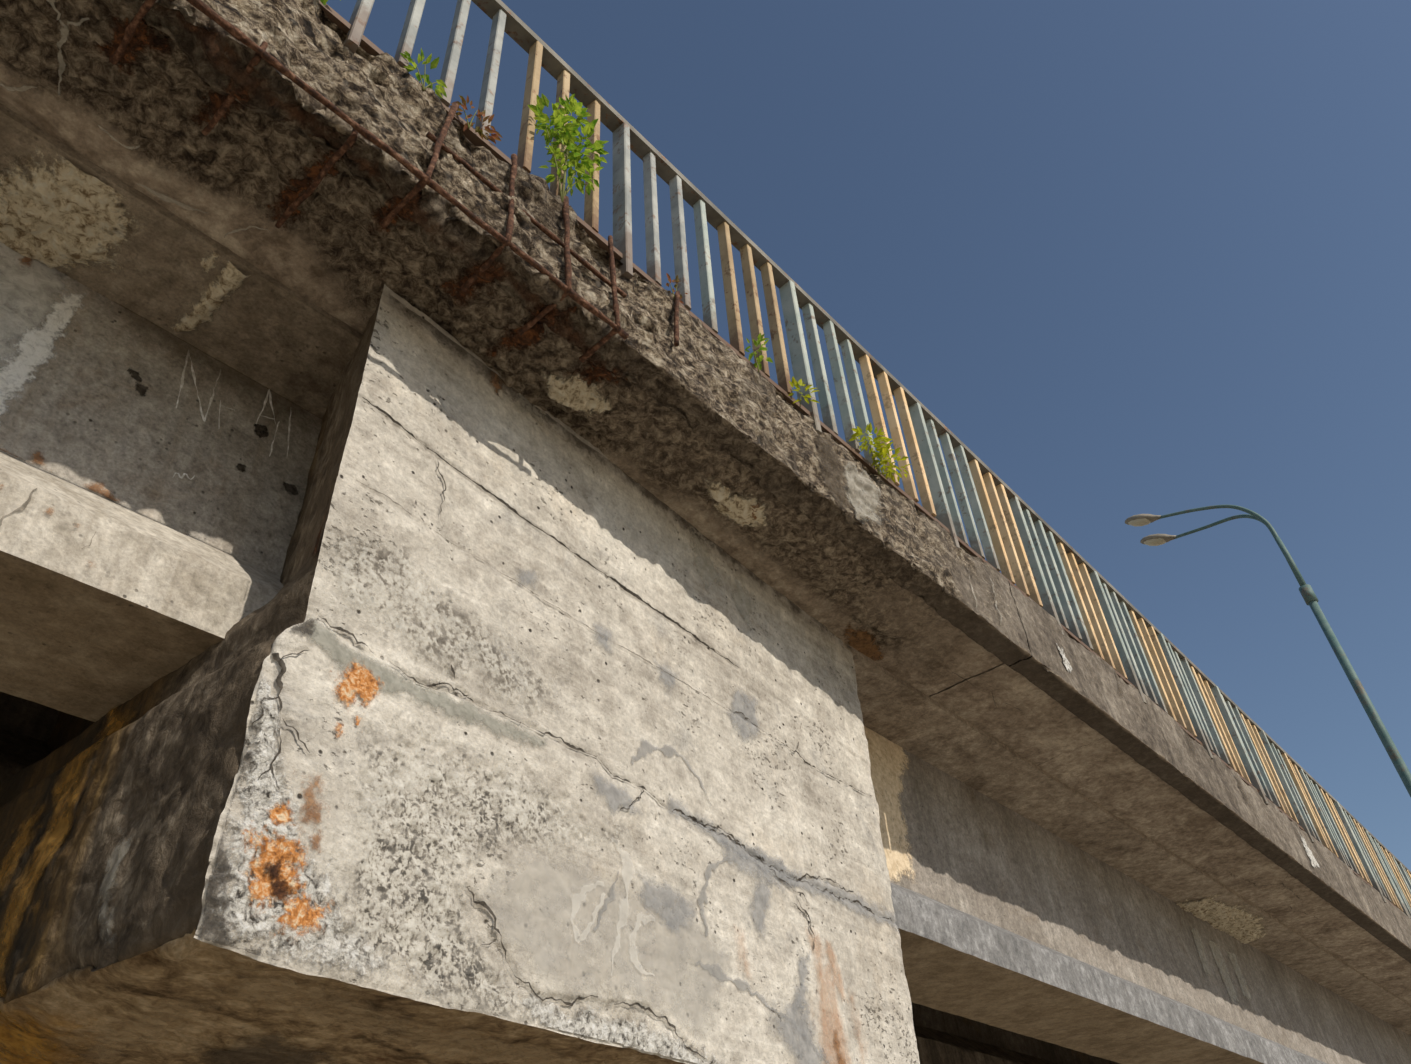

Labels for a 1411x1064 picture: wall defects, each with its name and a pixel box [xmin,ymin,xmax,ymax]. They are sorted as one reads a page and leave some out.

corrosion [86,13,170,75]
spalling [0,151,138,270]
water stain [0,242,84,414]
spalling [128,368,149,396]
corrosion [487,303,577,394]
corrosion [335,661,383,737]
crack [252,615,893,953]
corrosion [242,776,331,935]
crack [467,887,705,1059]
corrosion [814,940,846,1064]